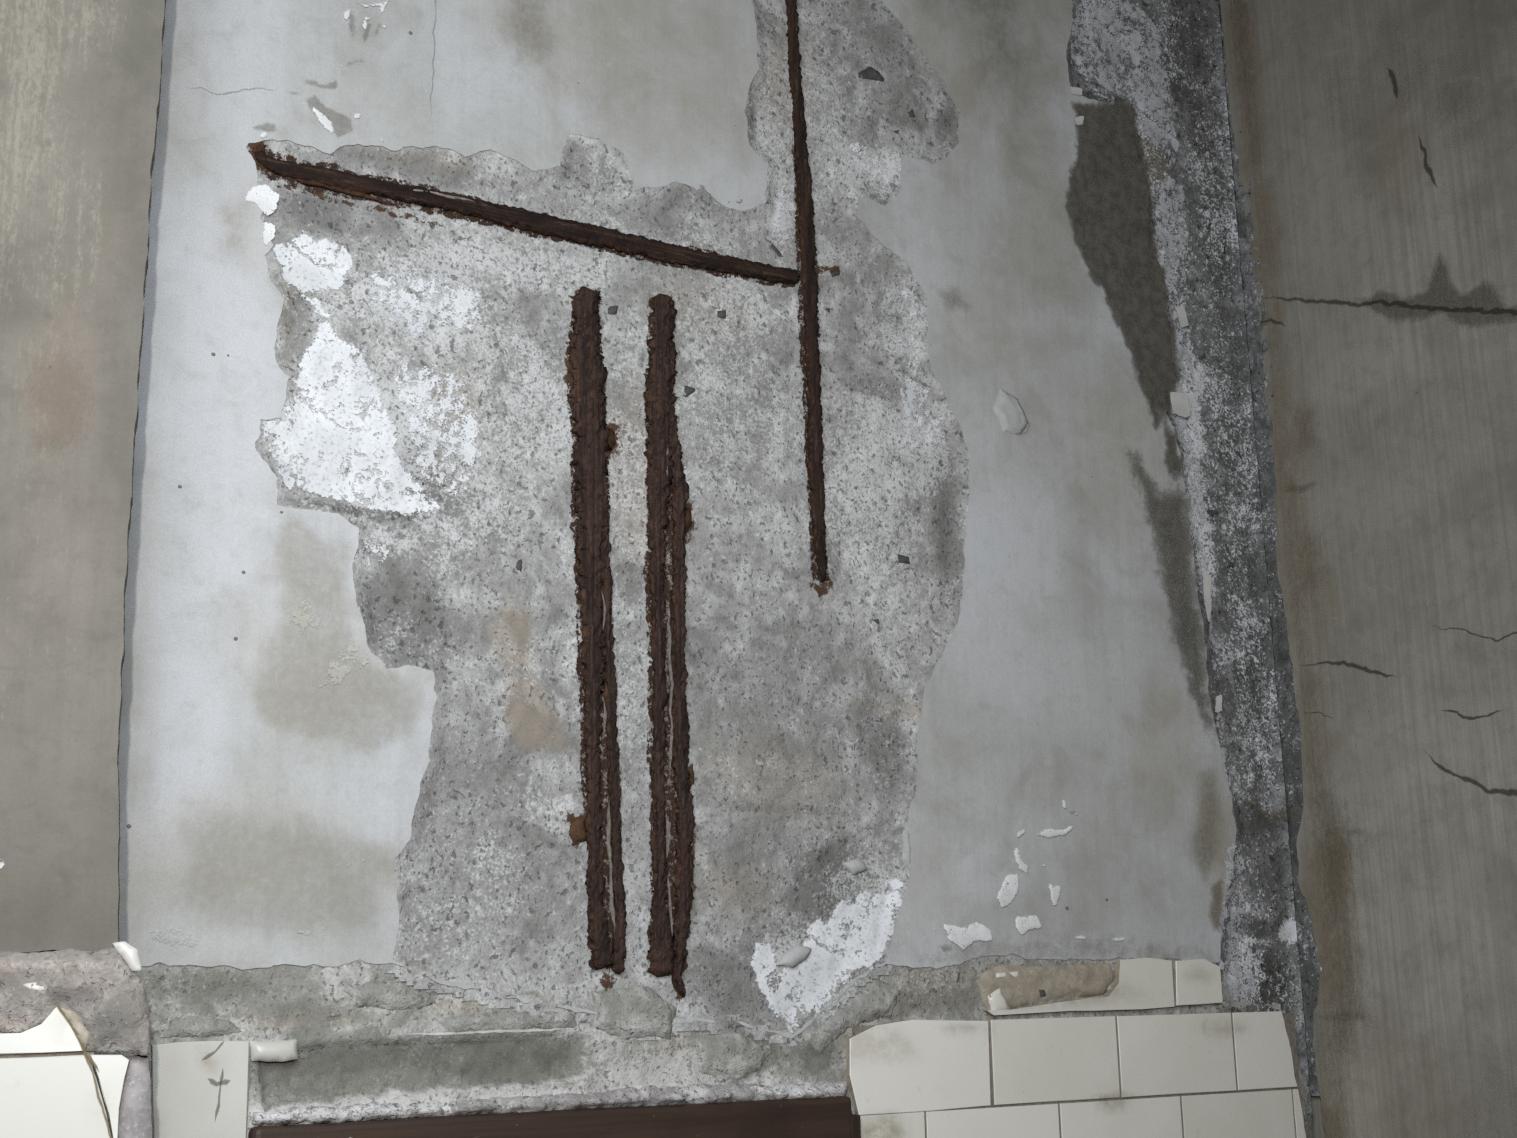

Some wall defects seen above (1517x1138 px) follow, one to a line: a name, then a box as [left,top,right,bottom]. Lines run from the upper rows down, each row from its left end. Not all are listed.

rust [248,0,841,598]
leakage [1066,0,1238,801]
crack [1256,296,1517,325]
rust [563,286,628,991]
rust [643,293,697,1001]
spalling [135,0,1322,1138]
crack [1301,660,1393,677]
crack [1429,625,1517,642]
crack [1426,752,1517,795]
leakage [1212,843,1256,1005]
spalling [0,941,152,1138]